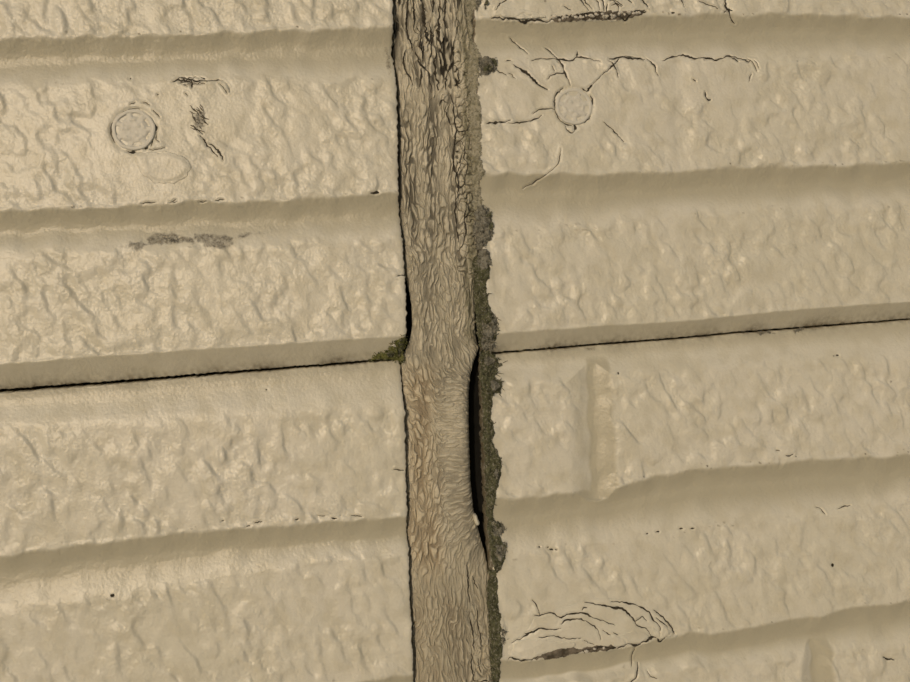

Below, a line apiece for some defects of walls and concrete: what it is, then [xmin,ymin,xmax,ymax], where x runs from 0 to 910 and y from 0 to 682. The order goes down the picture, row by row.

crack [110,76,230,154]
crack [197,129,223,160]
crack [402,0,759,242]
peeling [508,598,674,662]